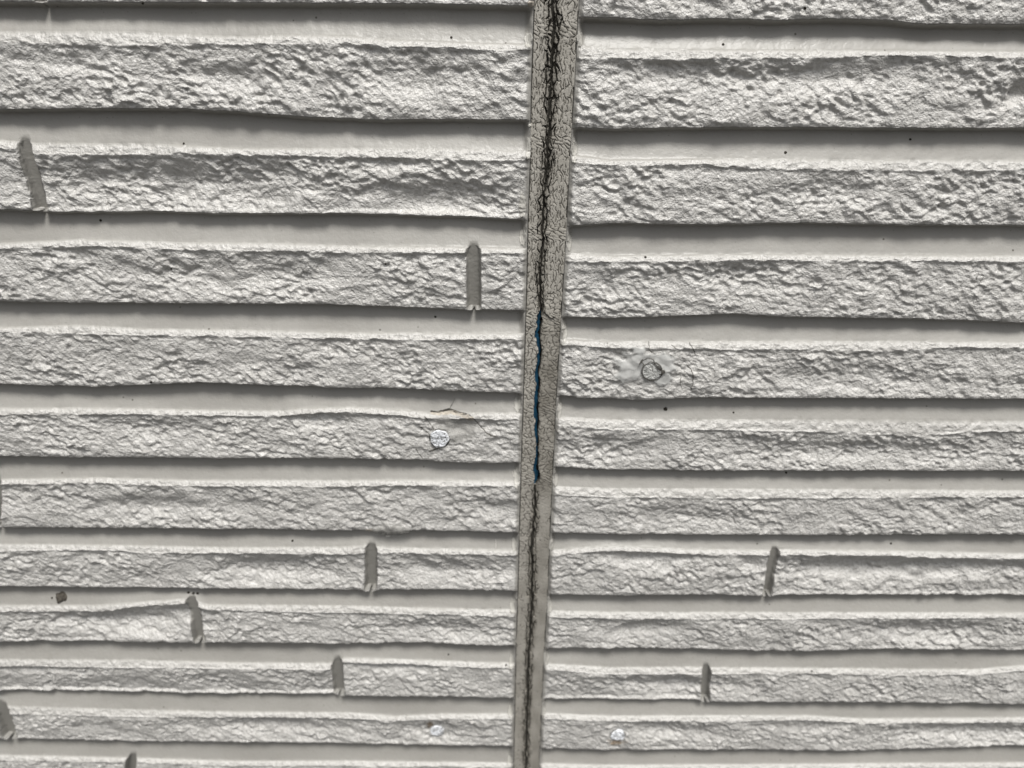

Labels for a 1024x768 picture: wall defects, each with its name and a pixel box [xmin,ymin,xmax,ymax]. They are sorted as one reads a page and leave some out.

crack [513,0,578,768]